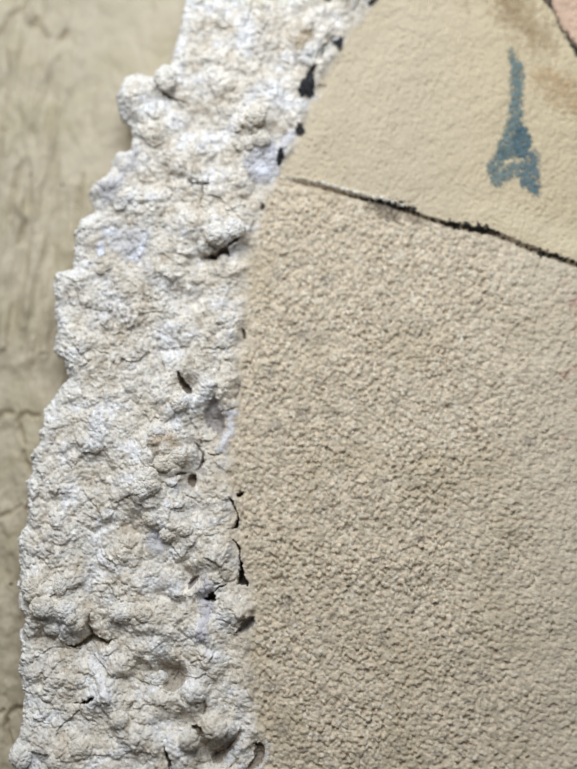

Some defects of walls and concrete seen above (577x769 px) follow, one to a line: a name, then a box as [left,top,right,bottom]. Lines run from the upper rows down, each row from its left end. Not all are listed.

crack [153,78,184,103]
crack [189,180,210,203]
crack [229,492,249,587]